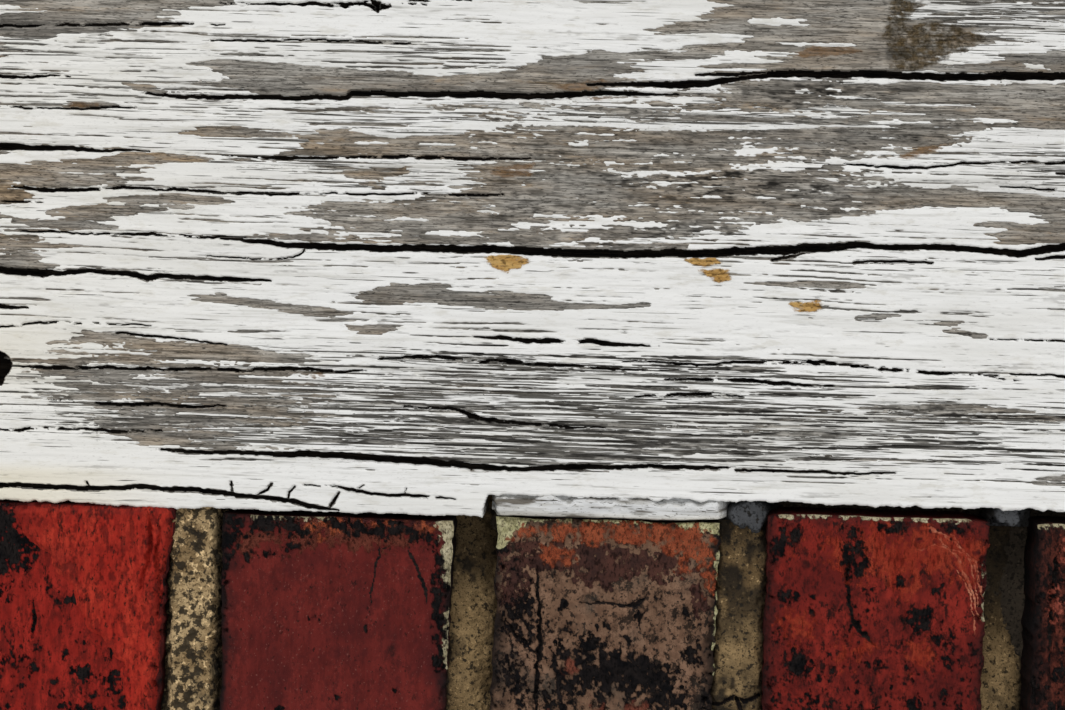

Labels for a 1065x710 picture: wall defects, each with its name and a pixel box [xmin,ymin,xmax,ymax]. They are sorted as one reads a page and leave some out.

peeling [0,0,234,57]
crack [13,69,1065,110]
crack [0,143,150,152]
peeling [178,0,1065,251]
peeling [0,151,235,269]
crack [3,185,504,203]
crack [0,230,1065,282]
peeling [190,293,397,335]
peeling [354,283,651,311]
crack [0,303,1065,398]
peeling [3,330,361,451]
crack [0,399,896,511]